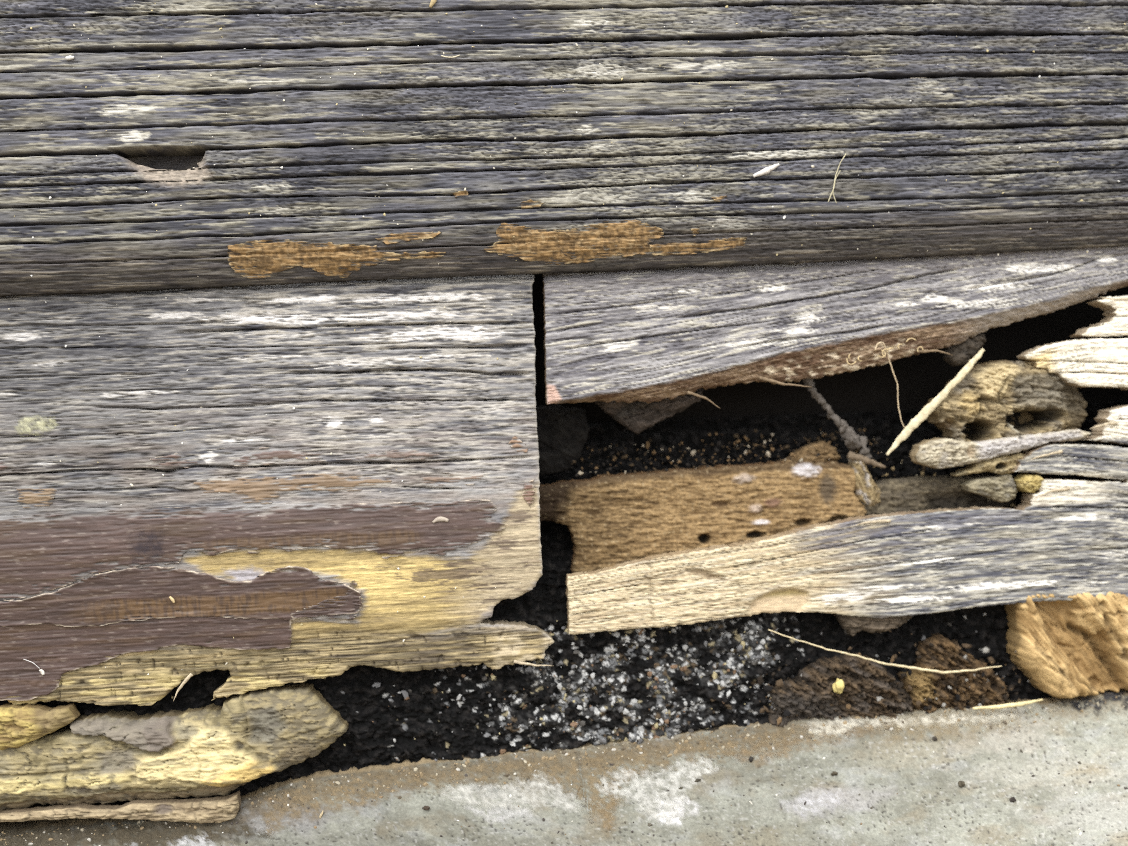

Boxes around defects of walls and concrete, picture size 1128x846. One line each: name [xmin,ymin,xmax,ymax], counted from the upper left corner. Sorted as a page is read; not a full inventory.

peeling [227,231,446,280]
peeling [484,220,747,265]
peeling [522,479,535,506]
peeling [0,447,508,701]